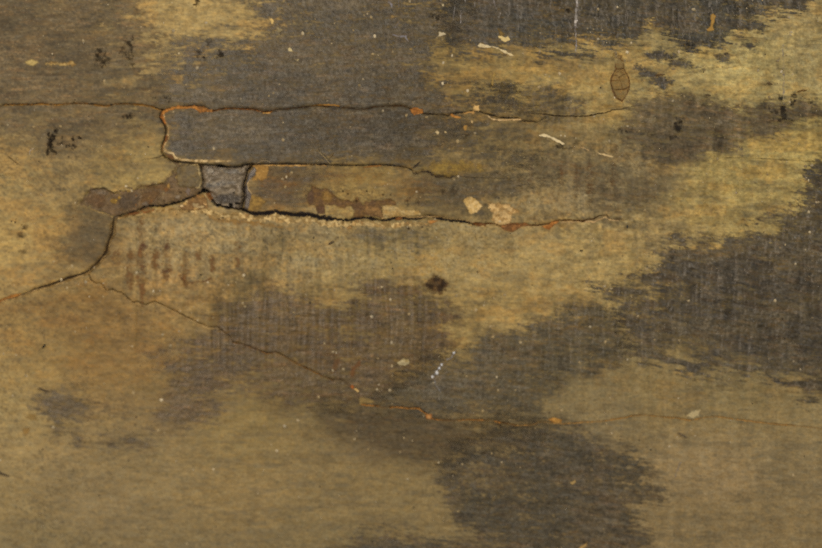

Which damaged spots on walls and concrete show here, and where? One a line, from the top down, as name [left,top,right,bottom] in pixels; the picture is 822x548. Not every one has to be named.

spalling [79,160,269,219]
crack [0,102,624,328]
water stain [0,0,822,210]
crack [232,341,527,426]
water stain [148,159,822,548]
crack [547,414,792,426]